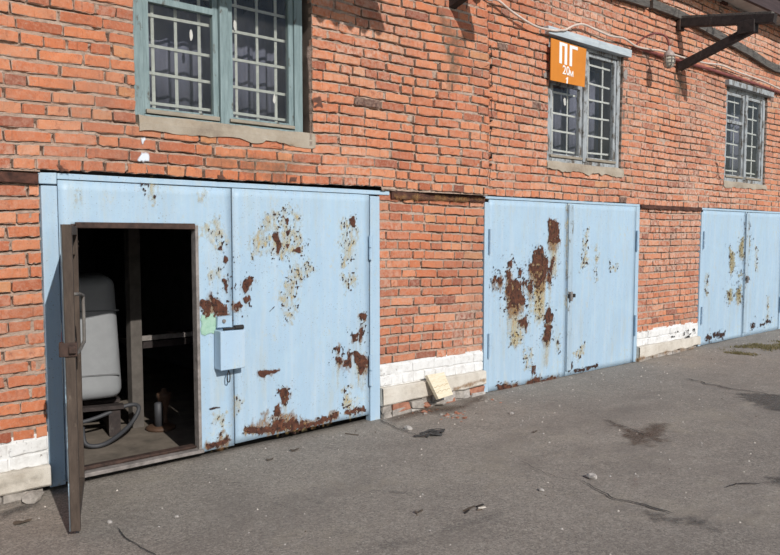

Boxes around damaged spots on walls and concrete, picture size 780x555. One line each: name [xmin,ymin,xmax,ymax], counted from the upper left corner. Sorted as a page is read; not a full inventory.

rust [200,244,254,321]
spalling [251,204,303,260]
spalling [281,261,314,321]
rust [489,218,561,358]
rust [725,212,754,310]
rust [332,312,369,384]
rust [496,364,558,390]
rust [206,430,231,450]
rust [242,385,366,436]